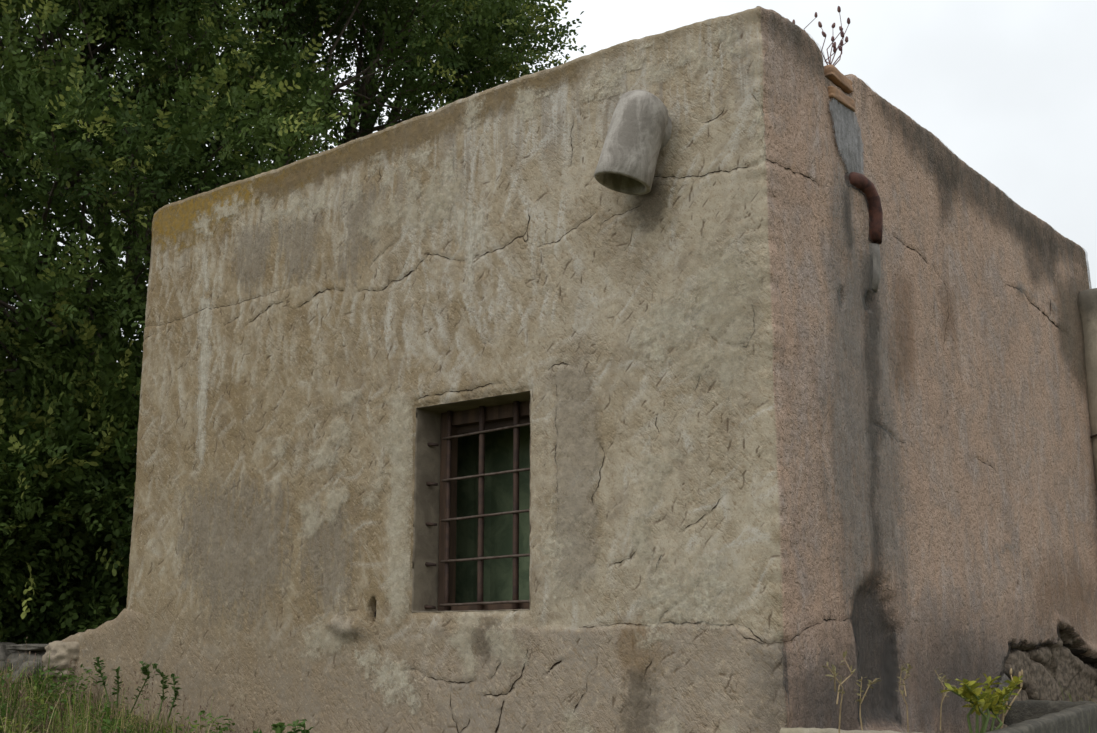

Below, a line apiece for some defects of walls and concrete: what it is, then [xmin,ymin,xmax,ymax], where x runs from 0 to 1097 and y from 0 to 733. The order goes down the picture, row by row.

crack [654,159,819,185]
crack [143,207,636,342]
crack [579,605,849,644]
crack [403,649,561,733]
flaking render [993,628,1097,730]